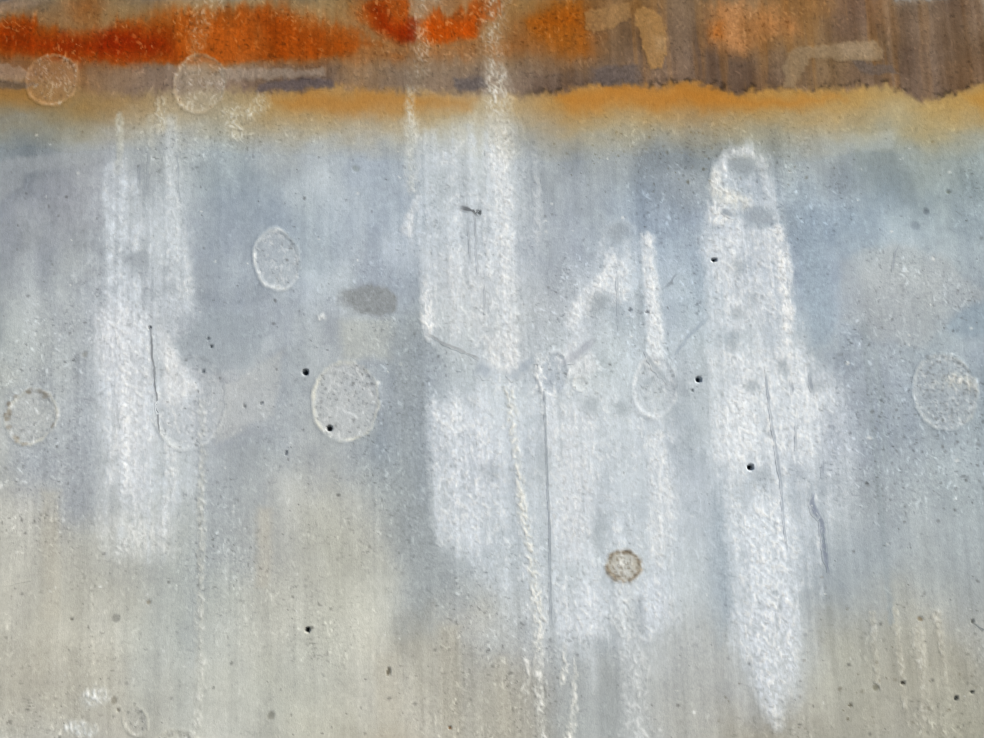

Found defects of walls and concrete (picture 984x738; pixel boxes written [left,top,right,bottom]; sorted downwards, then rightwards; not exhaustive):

rust [0,0,194,73]
rust [204,0,410,70]
rust [428,0,483,51]
rust [508,0,607,77]
rust [696,0,814,65]
rust [0,92,161,154]
rust [167,89,404,162]
rust [416,95,483,123]
rust [514,85,984,164]
water stain [46,67,212,738]
water stain [216,0,984,738]